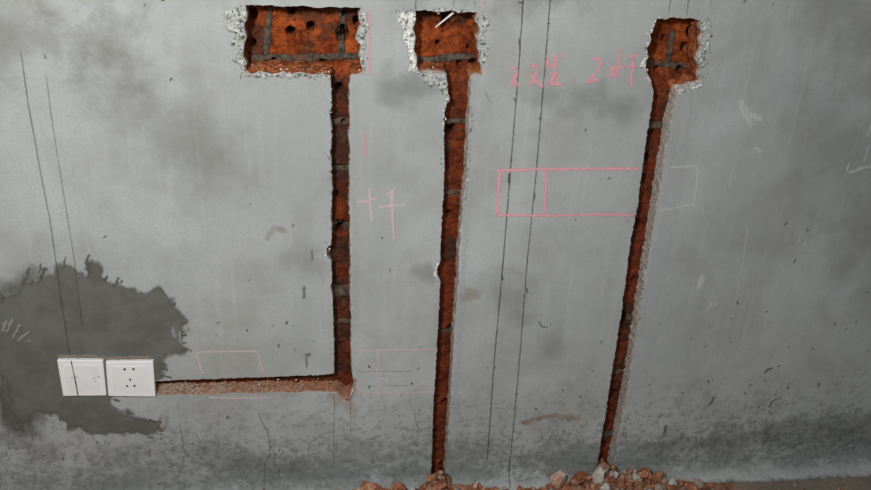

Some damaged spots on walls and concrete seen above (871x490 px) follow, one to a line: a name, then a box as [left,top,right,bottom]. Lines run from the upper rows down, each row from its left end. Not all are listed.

spalling [156,5,370,401]
spalling [389,9,450,185]
spalling [432,7,491,475]
spalling [601,11,713,466]